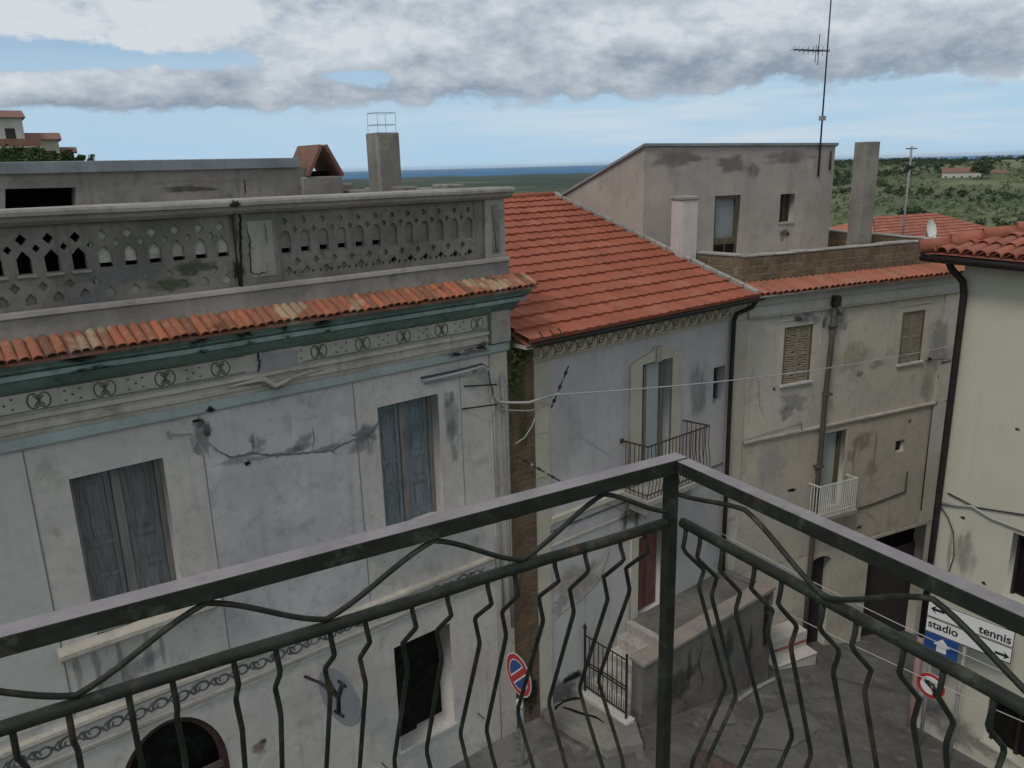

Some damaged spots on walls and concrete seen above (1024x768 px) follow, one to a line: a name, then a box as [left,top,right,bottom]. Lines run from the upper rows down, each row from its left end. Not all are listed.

crack [229,179,269,287]
spalling [192,408,214,455]
crack [209,421,379,458]